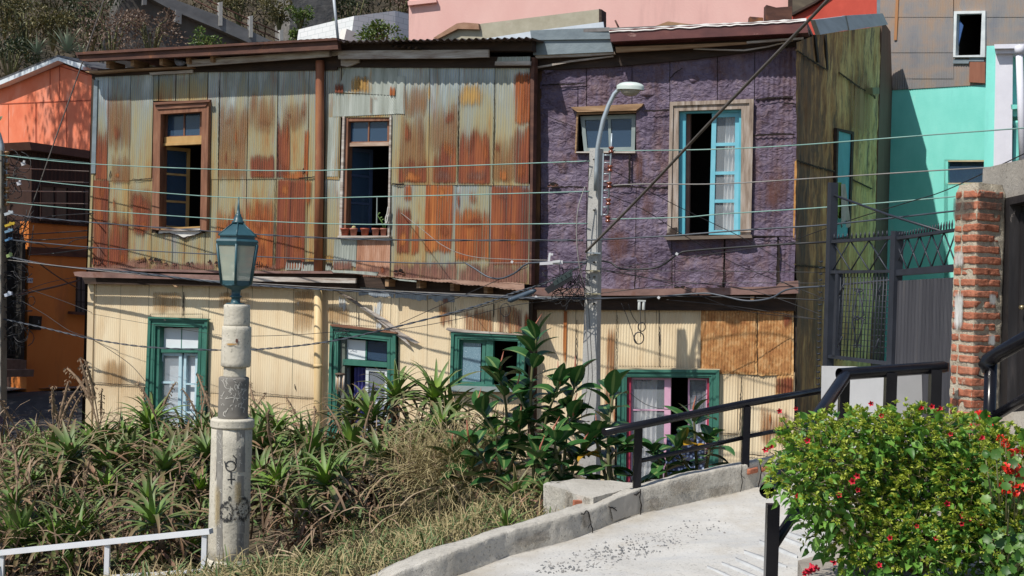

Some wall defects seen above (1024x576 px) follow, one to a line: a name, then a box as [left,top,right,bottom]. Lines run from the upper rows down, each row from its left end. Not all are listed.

corrosion [93,72,530,283]